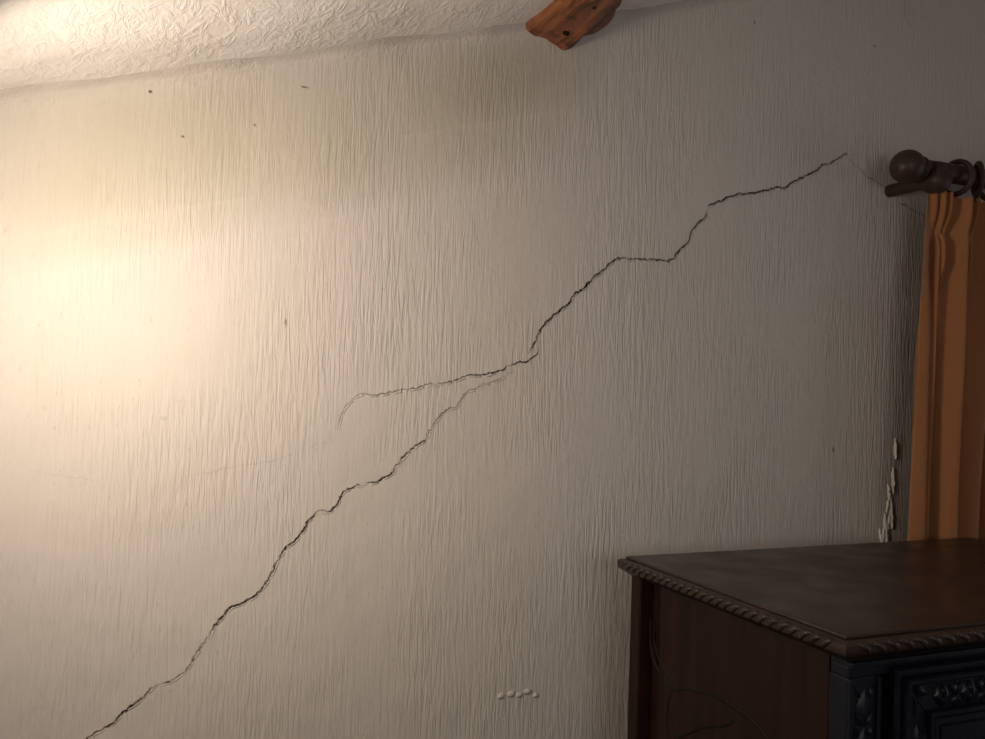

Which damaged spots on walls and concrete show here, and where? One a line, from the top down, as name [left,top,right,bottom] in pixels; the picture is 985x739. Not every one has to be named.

crack [86,153,873,739]